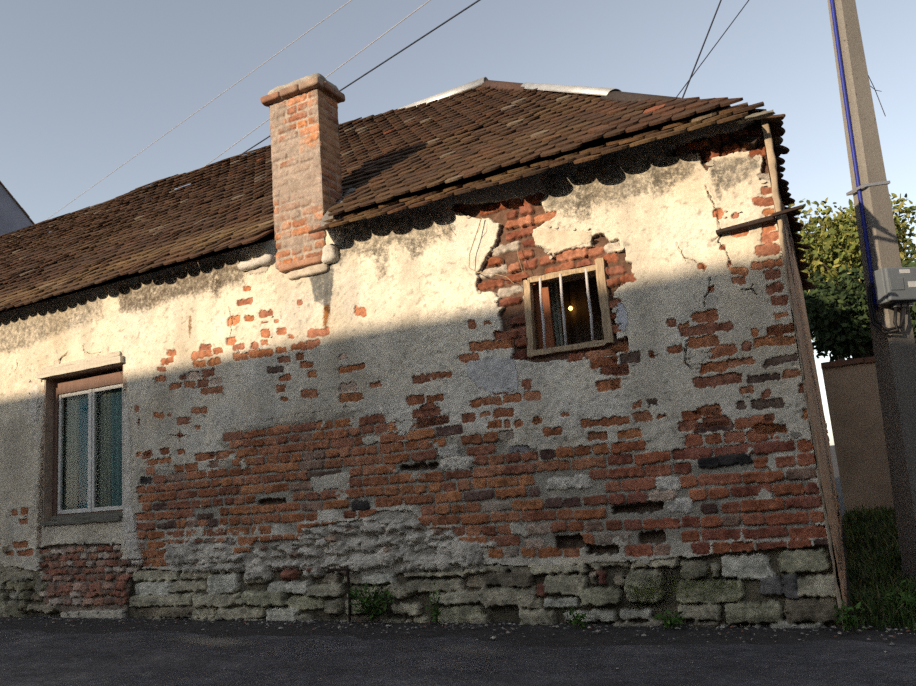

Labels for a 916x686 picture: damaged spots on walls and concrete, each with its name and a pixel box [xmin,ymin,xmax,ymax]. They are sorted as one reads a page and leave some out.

spalling [0,120,828,616]